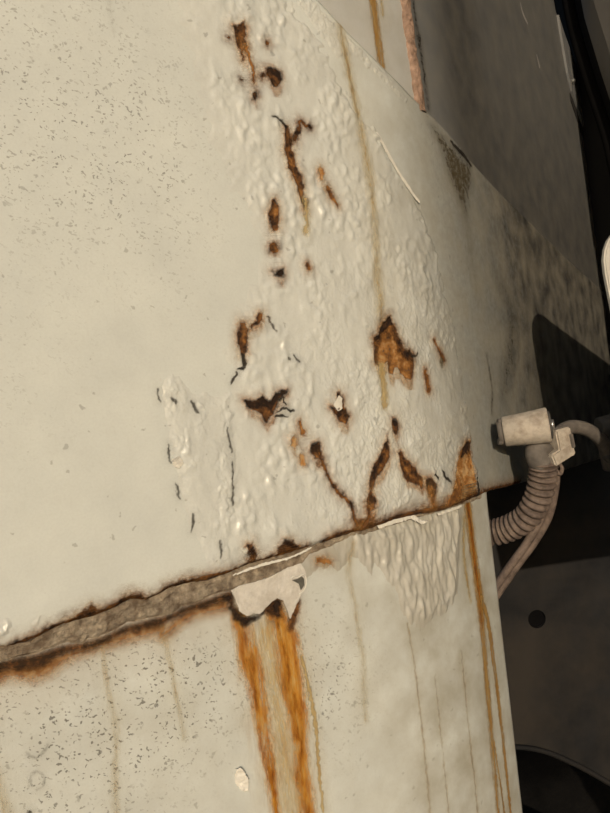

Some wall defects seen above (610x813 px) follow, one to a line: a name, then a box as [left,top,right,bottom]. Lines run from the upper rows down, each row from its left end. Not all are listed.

rust [226,21,283,101]
rust [272,115,313,234]
rust [267,198,280,256]
rust [231,311,263,384]
rust [373,316,418,409]
rust [243,388,295,426]
peeling [377,515,428,529]
rust [7,538,309,646]
peeling [231,547,312,619]
rust [320,441,521,813]
rust [0,591,324,813]
peeling [235,768,249,792]